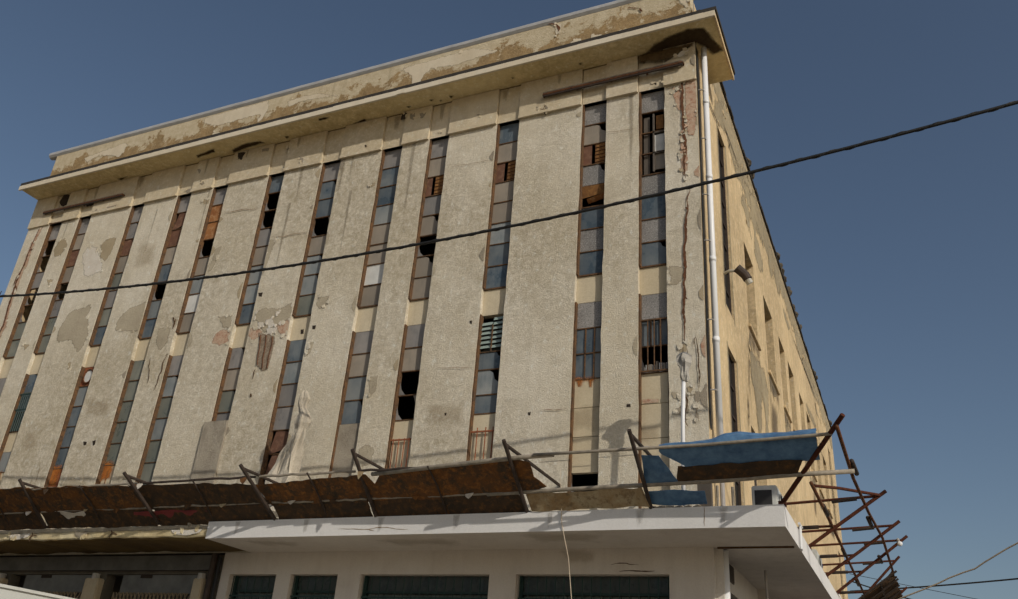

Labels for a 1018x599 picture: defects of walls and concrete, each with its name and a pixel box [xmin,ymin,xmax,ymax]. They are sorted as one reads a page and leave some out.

peeling [401,48,497,84]
spalling [651,80,699,177]
flaking render [100,236,116,260]
crack [679,81,700,426]
flaking render [712,82,832,447]
flaking render [52,305,91,352]
spalling [212,313,232,346]
flaking render [249,304,293,371]